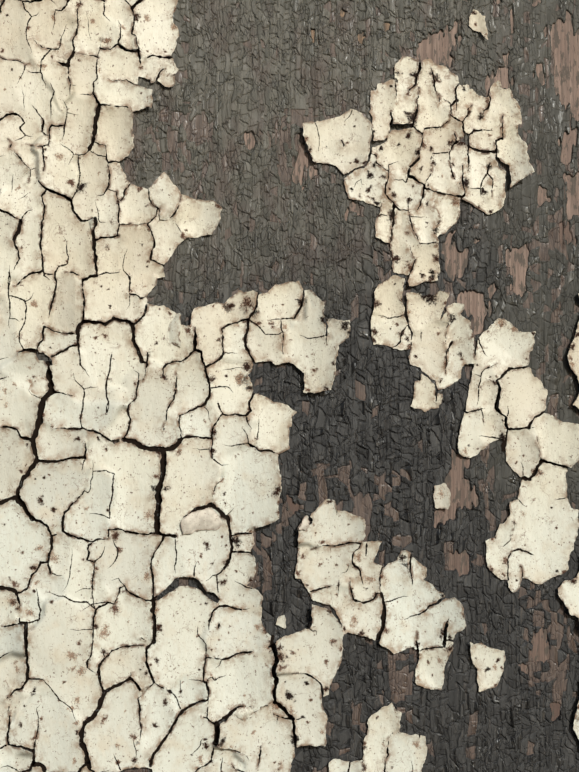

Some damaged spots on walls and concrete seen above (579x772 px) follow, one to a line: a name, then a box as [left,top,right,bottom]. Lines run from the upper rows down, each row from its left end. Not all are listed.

crack [369,62,503,276]
peeling [292,10,579,618]
crack [0,0,327,772]
peeling [0,0,351,772]
crack [464,338,568,481]
peeling [276,499,466,748]
crack [310,542,442,640]
peeling [328,703,427,772]
crack [416,619,451,652]
peeling [470,642,505,692]
crack [503,538,533,580]
peeling [521,628,549,674]